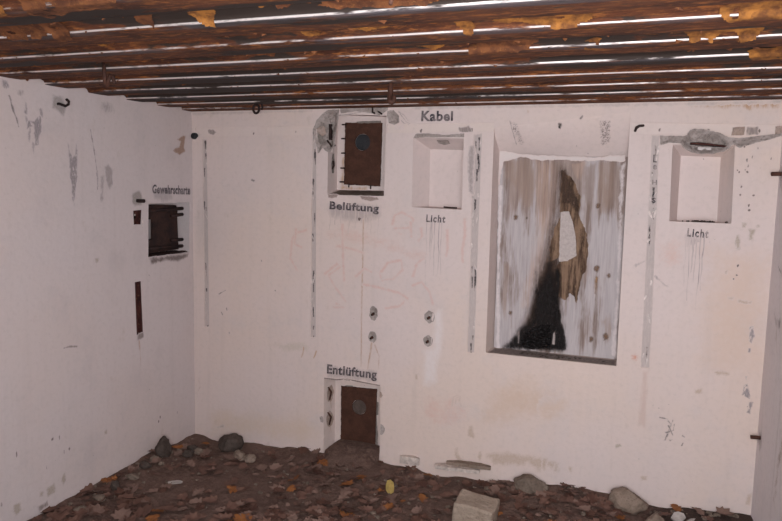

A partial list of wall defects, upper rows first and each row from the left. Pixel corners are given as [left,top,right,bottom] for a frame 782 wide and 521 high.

rust [0,0,116,41]
rust [187,10,216,28]
rust [685,0,782,60]
spalling [656,129,782,161]